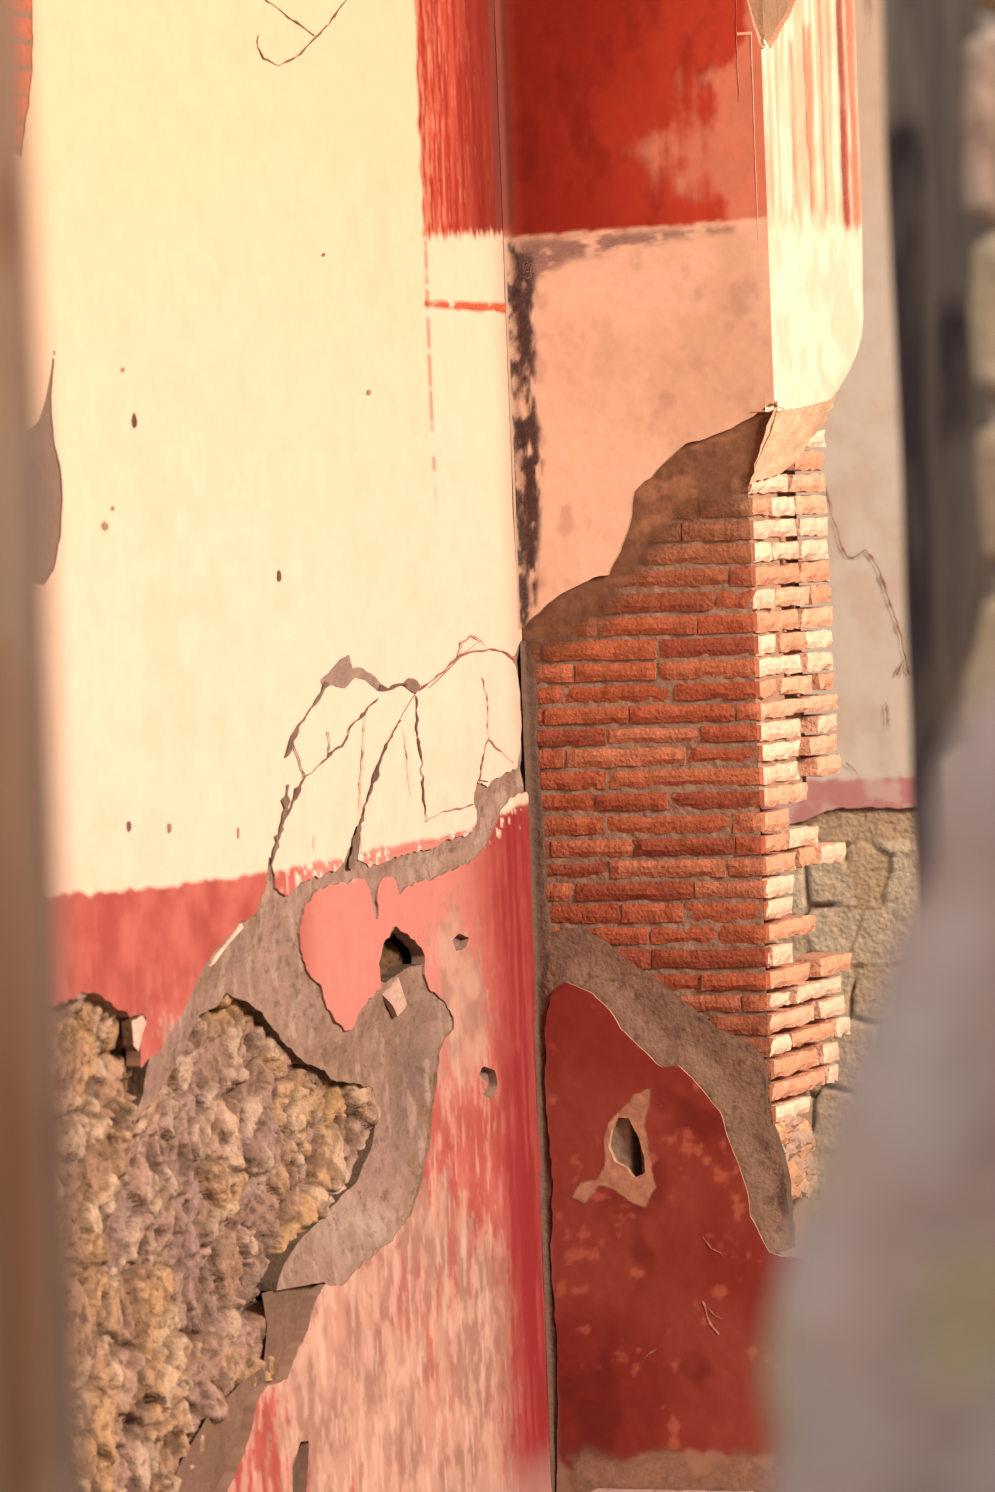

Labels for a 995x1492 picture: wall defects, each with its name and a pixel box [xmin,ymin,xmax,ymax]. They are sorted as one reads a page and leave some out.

flaking render [24,0,32,87]
crack [257,0,347,66]
flaking render [736,0,791,46]
leakage [507,246,540,625]
crack [826,489,908,728]
crack [269,635,516,881]
flaking render [66,391,916,1492]